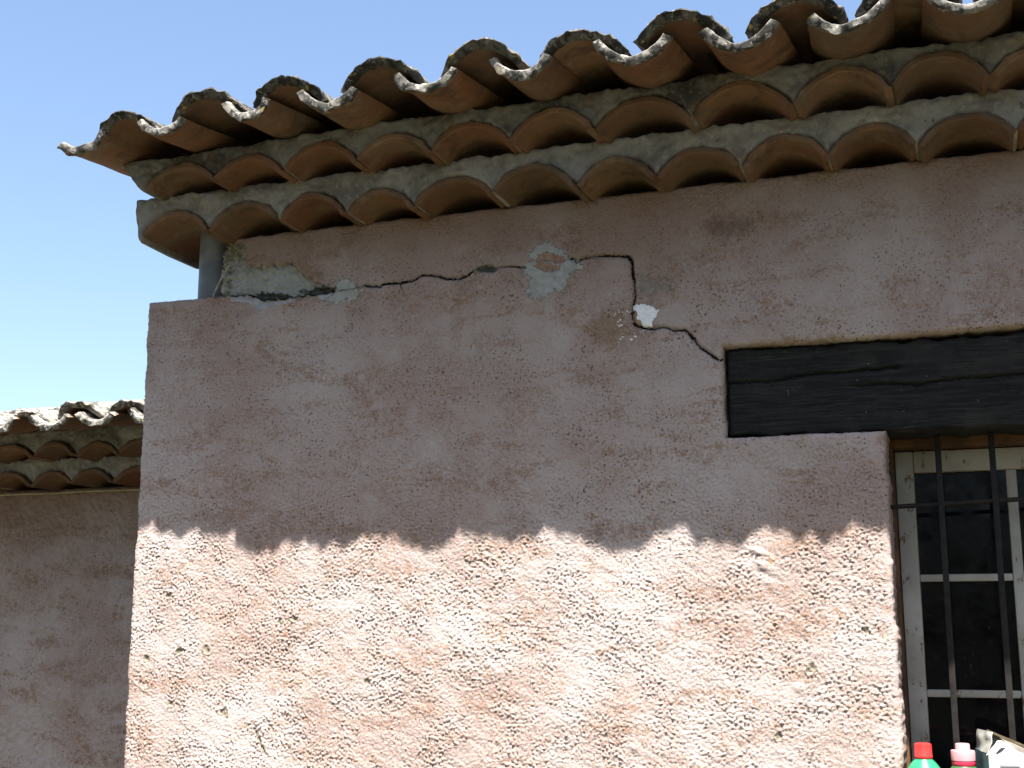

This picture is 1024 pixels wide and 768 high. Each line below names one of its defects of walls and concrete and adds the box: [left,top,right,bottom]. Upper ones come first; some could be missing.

flaking render [221,243,335,310]
crack [340,271,474,291]
flaking render [614,304,659,343]
crack [570,255,723,362]